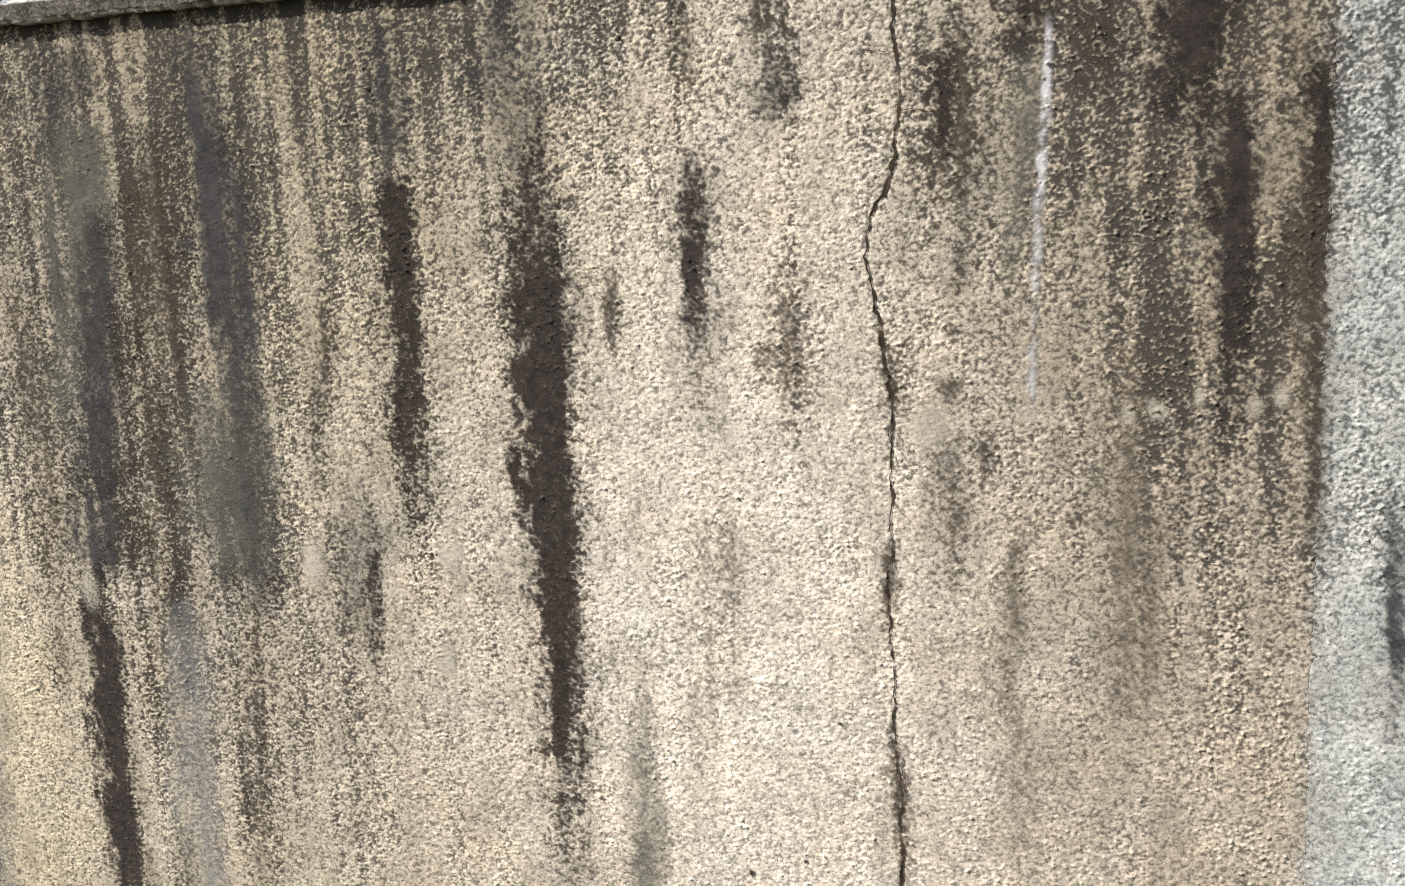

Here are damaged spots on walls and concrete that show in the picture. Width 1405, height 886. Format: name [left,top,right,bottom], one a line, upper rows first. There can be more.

water stain [7,28,275,886]
water stain [375,37,431,523]
water stain [490,90,591,854]
water stain [602,279,620,354]
water stain [669,155,717,377]
water stain [757,265,810,427]
crack [847,0,938,886]
water stain [924,7,986,295]
water stain [991,0,1063,289]
water stain [1133,0,1259,394]
water stain [1277,25,1334,570]
water stain [1375,484,1405,707]